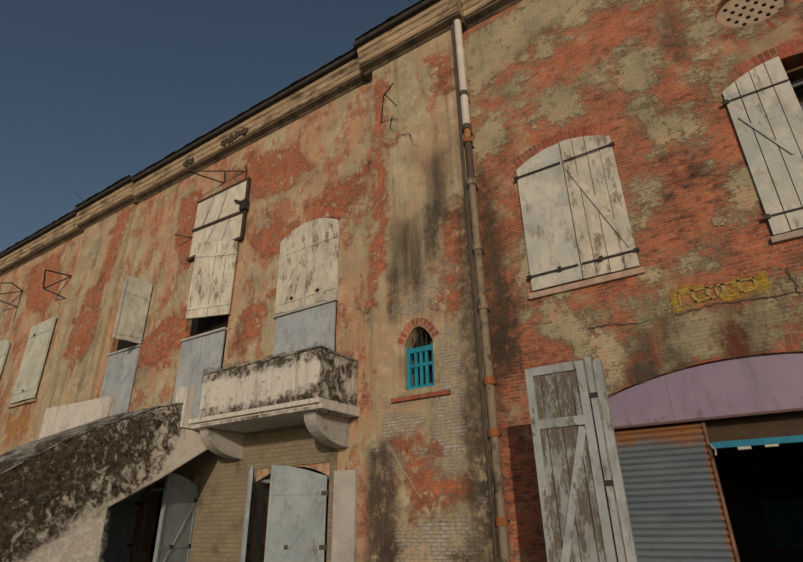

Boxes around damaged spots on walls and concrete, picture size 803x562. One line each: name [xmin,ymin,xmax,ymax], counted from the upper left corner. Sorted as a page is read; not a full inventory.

peeling [425,0,710,178]
flaking render [250,76,396,313]
damp [430,158,448,220]
peeling [698,158,761,226]
flaking render [63,207,132,370]
mould [201,343,358,425]
damp [459,173,514,562]
crack [587,318,653,333]
peeling [500,233,803,395]
crack [675,268,801,315]
mould [0,402,182,562]
damp [366,443,397,562]